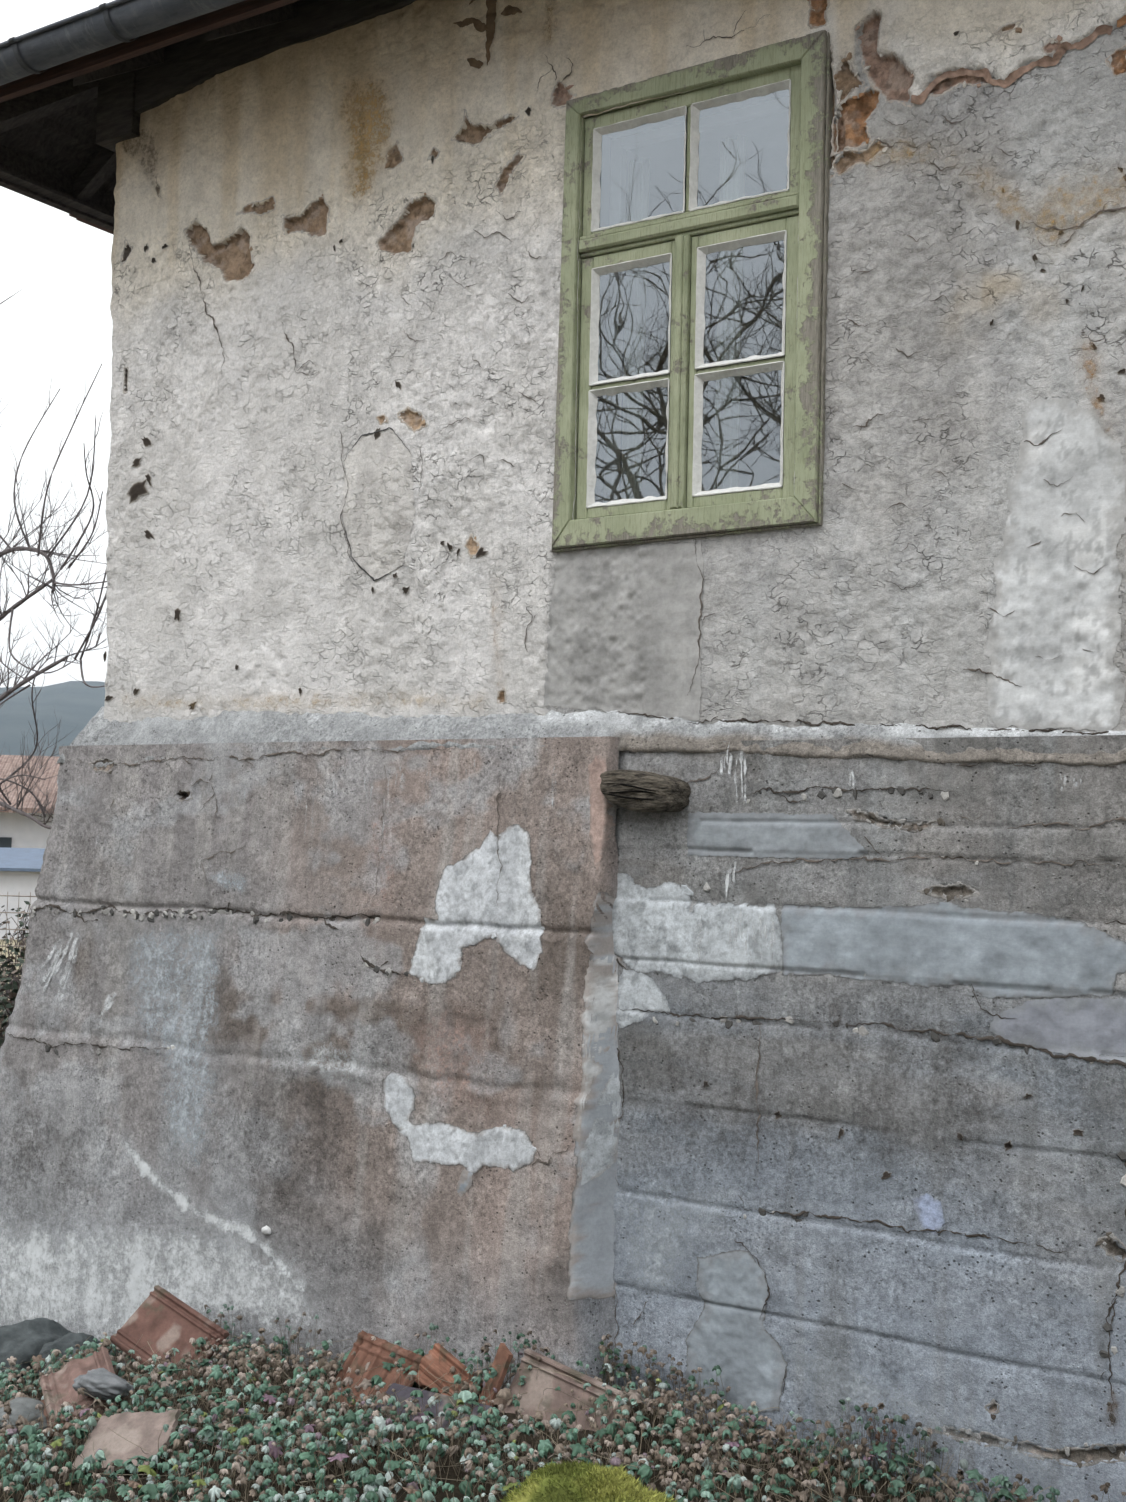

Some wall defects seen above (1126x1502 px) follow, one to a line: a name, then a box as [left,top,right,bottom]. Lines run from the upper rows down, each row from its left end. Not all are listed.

flaking render [829,9,1126,187]
flaking render [183,194,343,283]
flaking render [375,192,437,257]
crack [31,748,476,978]
peeling [408,824,545,985]
peeling [612,873,783,1028]
peeling [382,1070,537,1174]
crack [614,1282,648,1355]
crack [615,958,1126,1165]
crack [734,1196,1087,1315]
crack [1099,1261,1126,1454]
crack [1117,1150,1126,1218]